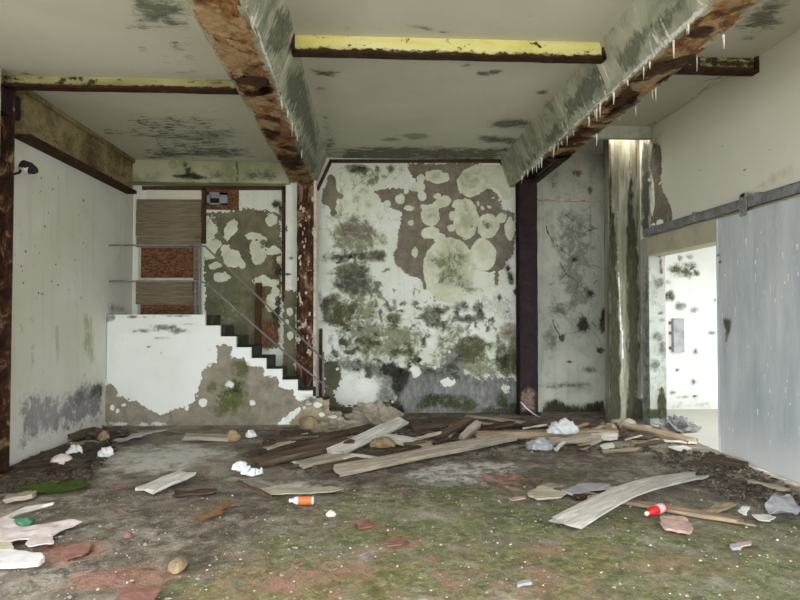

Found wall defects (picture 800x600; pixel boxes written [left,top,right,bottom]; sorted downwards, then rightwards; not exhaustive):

water stain [128,116,252,180]
water stain [495,120,531,128]
water stain [518,0,708,174]
water stain [641,142,656,229]
peeling [648,143,673,226]
peeling [105,205,363,426]
water stain [320,250,385,325]
water stain [328,265,516,413]
water stain [552,211,594,315]
water stain [578,317,589,332]
water stain [618,273,627,359]
water stain [22,384,165,436]